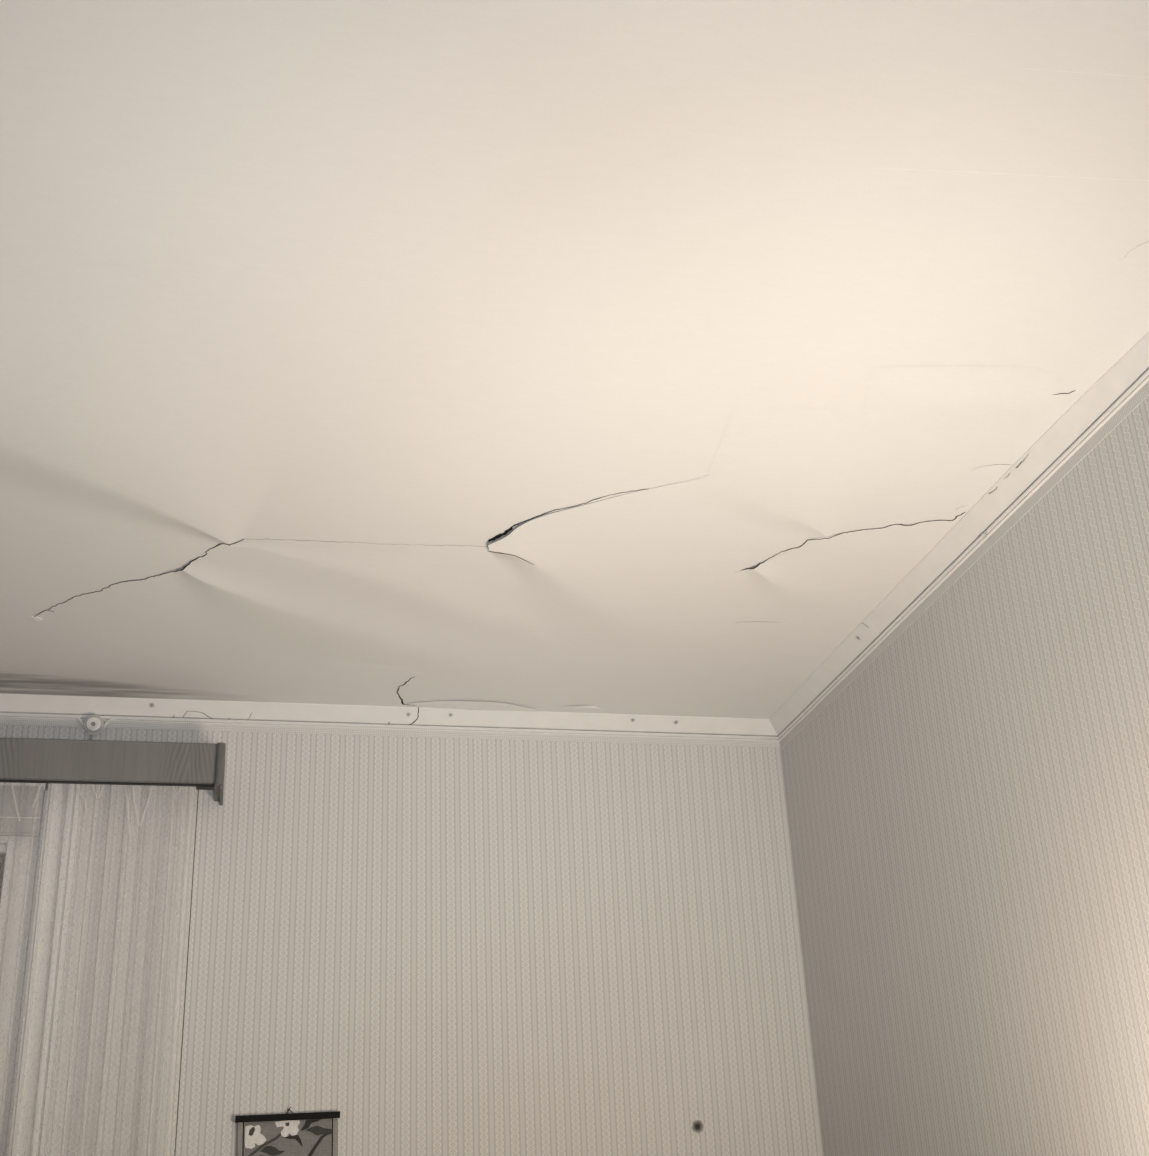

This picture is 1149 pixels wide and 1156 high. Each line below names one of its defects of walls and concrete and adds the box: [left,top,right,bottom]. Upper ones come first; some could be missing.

crack [31,476,704,622]
crack [737,506,965,572]